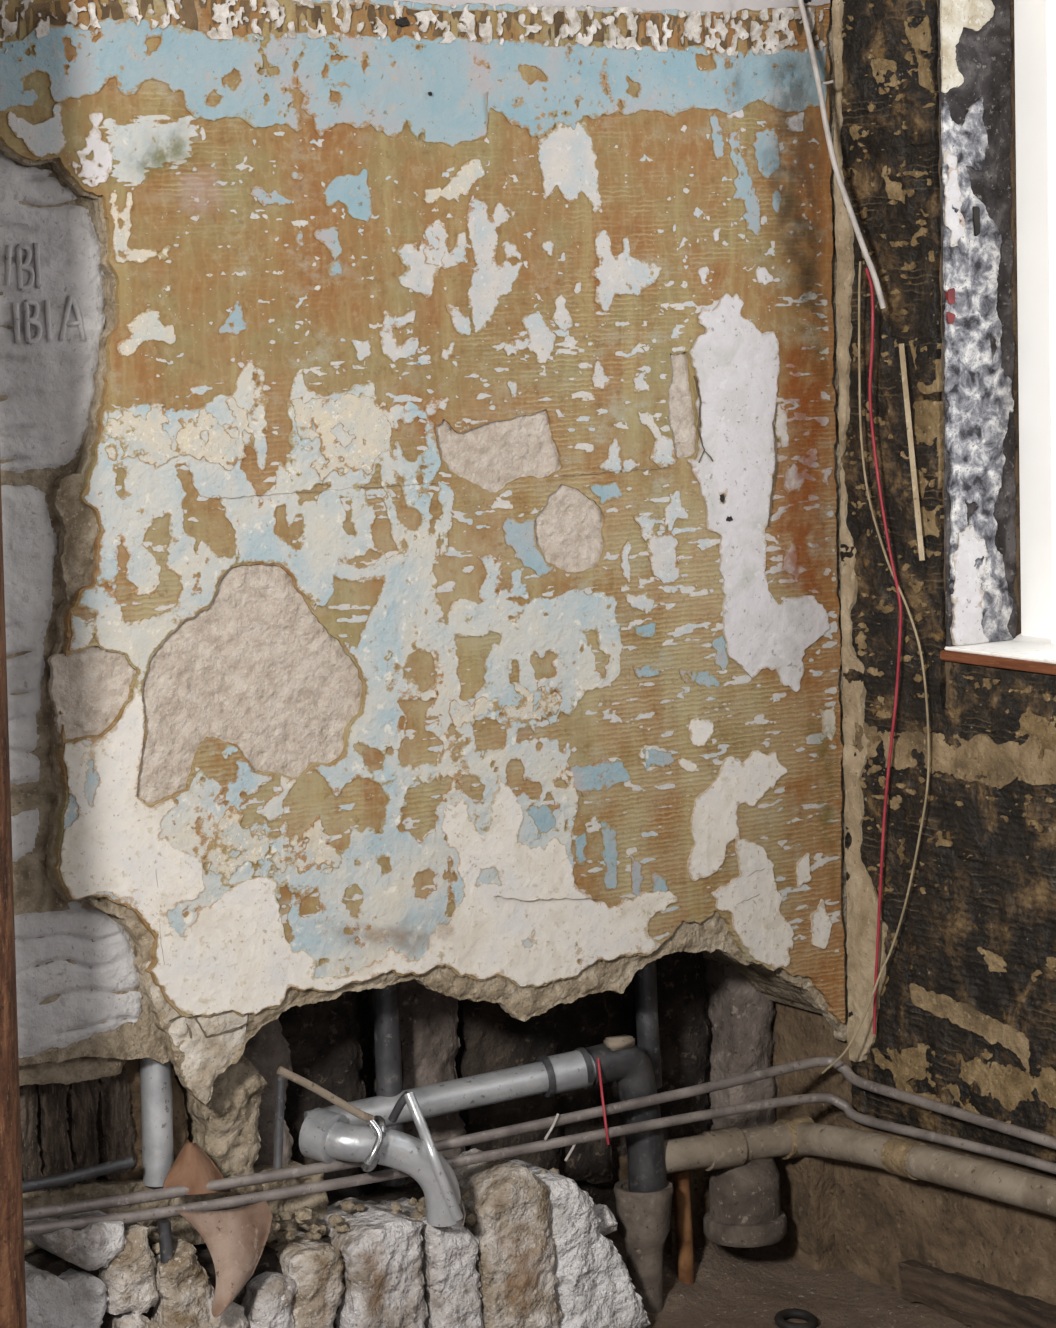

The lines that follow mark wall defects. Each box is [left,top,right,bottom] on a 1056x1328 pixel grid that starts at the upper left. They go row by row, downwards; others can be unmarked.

flaking render [0,154,105,473]
peeling [116,304,189,377]
peeling [211,153,386,281]
peeling [330,158,536,380]
peeling [464,287,657,410]
peeling [586,230,688,326]
peeling [743,241,781,292]
peeling [904,0,1014,646]
peeling [599,422,651,475]
flaking render [11,808,39,862]
peeling [977,947,1007,972]
peeling [909,983,1056,1114]